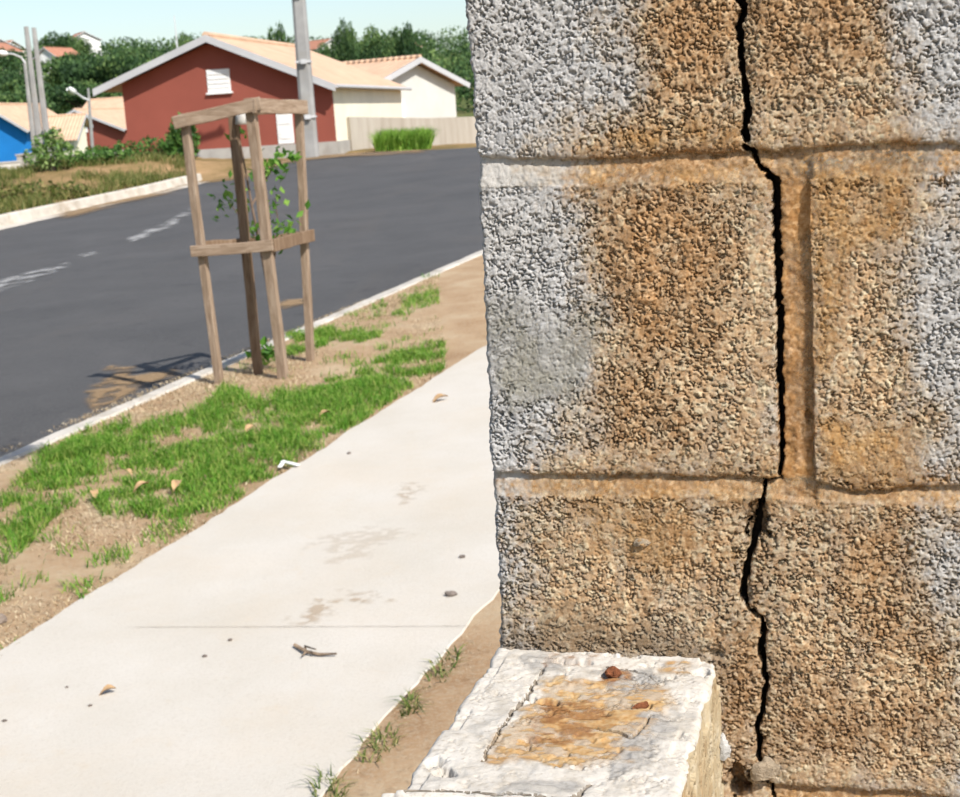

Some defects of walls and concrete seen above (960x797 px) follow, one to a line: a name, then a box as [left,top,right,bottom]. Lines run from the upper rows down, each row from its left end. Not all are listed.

rust [487,0,960,797]
crack [734,0,786,797]